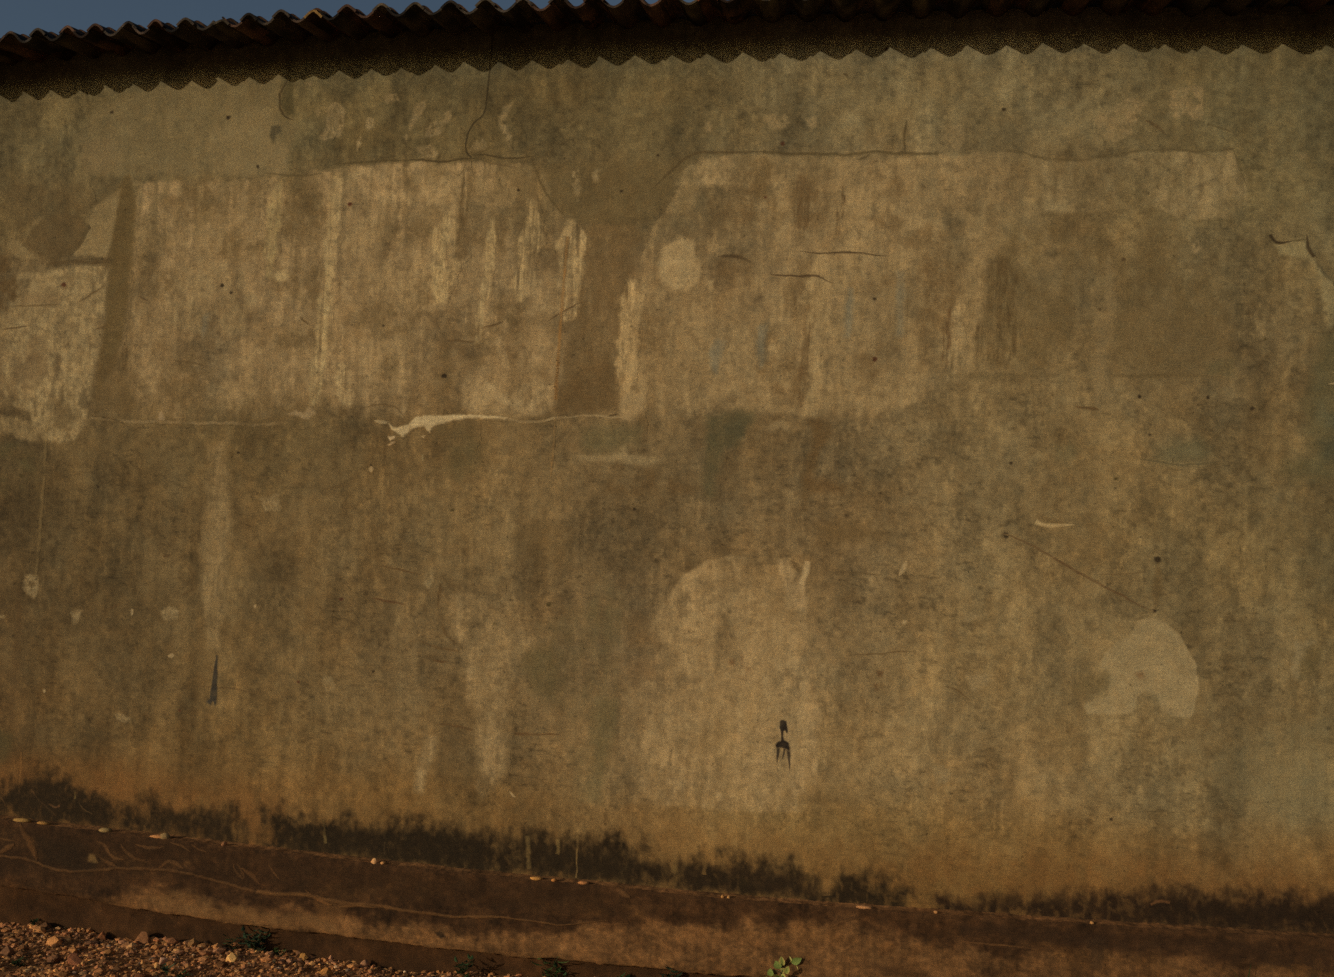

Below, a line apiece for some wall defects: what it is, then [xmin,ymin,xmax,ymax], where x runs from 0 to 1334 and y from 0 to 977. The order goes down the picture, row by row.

crack [266,33,565,216]
crack [653,119,939,188]
peeling [0,91,576,462]
leakage [426,160,651,423]
leakage [508,507,583,586]
leakage [1065,664,1116,705]
leakage [411,731,442,780]
leakage [1193,700,1334,841]
leakage [0,752,1334,977]